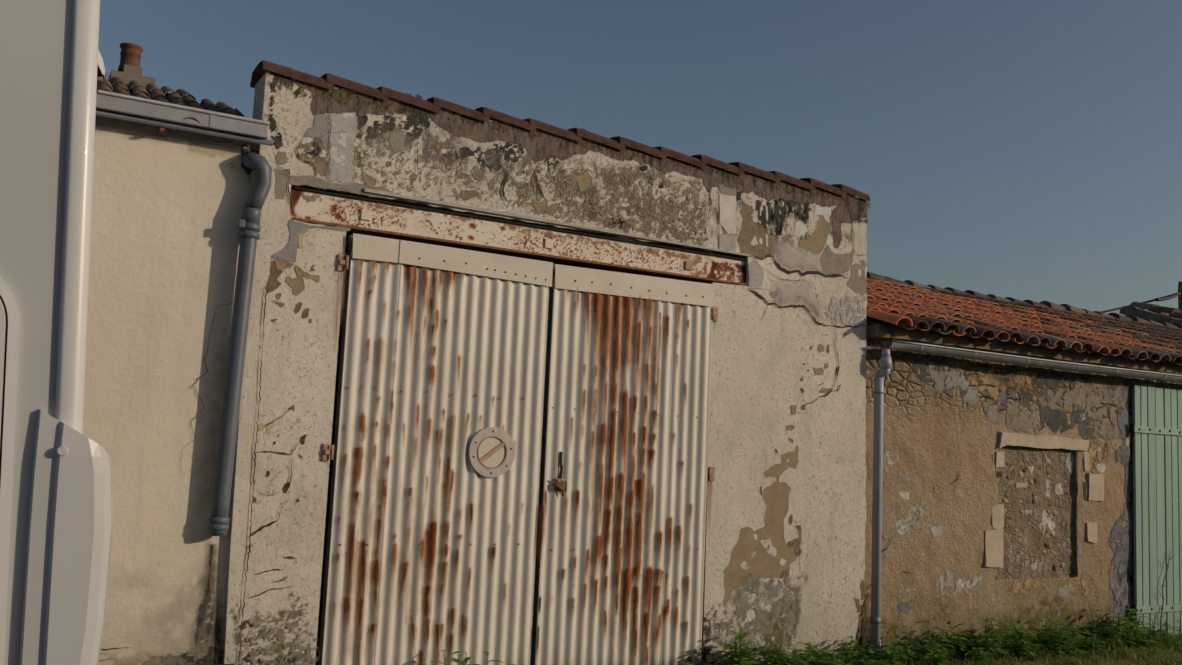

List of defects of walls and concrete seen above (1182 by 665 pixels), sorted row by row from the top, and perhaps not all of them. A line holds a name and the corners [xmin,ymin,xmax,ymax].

damp [143,545,223,665]
crack [180,303,232,478]
crack [238,284,301,665]
peeling [267,259,320,323]
rust [334,414,390,665]
rust [404,405,482,665]
rust [290,189,747,283]
peeling [275,130,778,259]
rust [562,290,692,665]
peeling [723,334,832,607]
crack [748,221,867,405]
peeling [793,205,867,296]